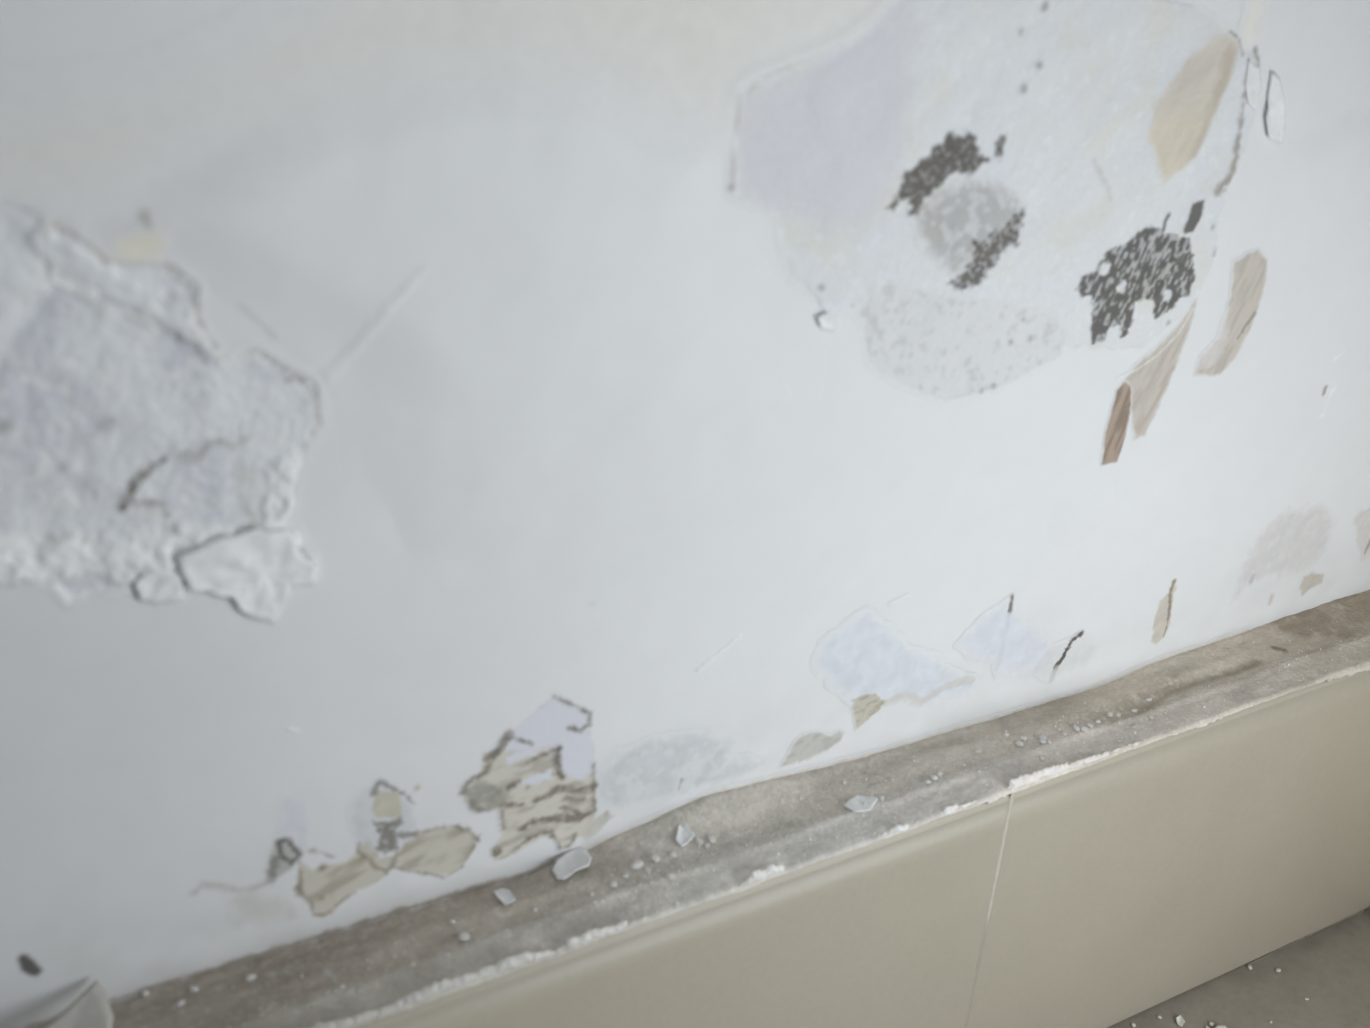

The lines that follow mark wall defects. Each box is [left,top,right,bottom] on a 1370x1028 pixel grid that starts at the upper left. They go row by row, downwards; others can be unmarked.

flaking render [0,194,330,623]
flaking render [722,0,1286,467]
peeling [291,822,483,920]
peeling [494,888,516,905]